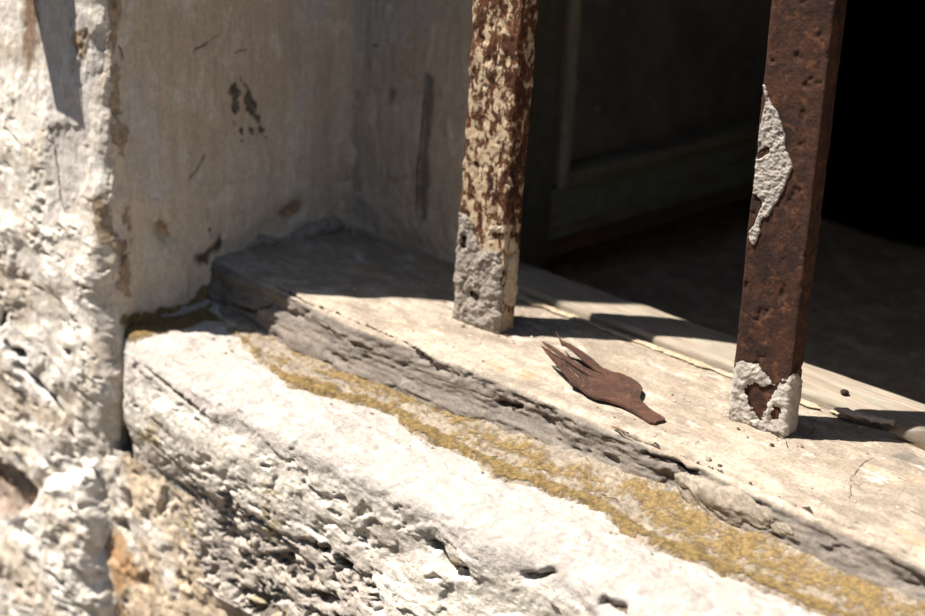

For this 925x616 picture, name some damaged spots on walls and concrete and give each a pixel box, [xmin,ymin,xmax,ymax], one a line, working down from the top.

damp [228,77,267,142]
peeling [749,85,793,245]